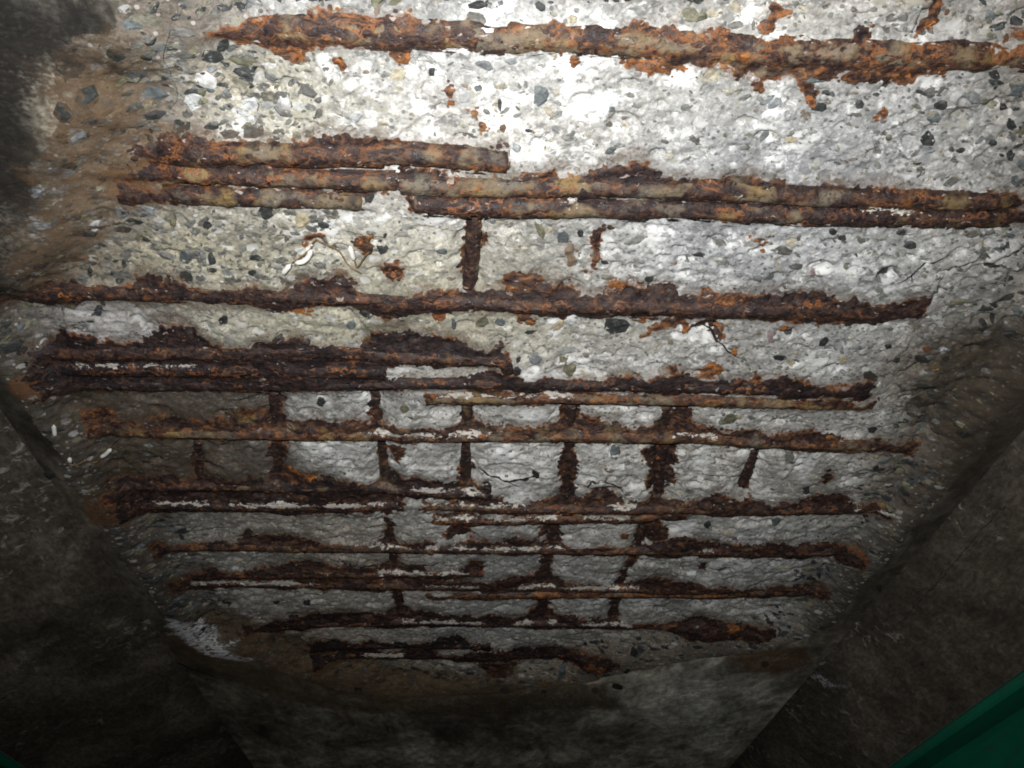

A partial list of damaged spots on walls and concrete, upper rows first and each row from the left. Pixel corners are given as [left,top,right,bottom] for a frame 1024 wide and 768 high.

corrosion [203,4,592,74]
corrosion [599,0,949,108]
leakage [0,0,146,296]
corrosion [379,259,405,282]
crack [898,256,947,284]
corrosion [628,287,755,355]
corrosion [11,357,409,528]
spalling [127,494,404,514]
crack [481,469,540,487]
spalling [431,511,689,549]
spalling [147,532,855,587]
spalling [167,570,833,621]